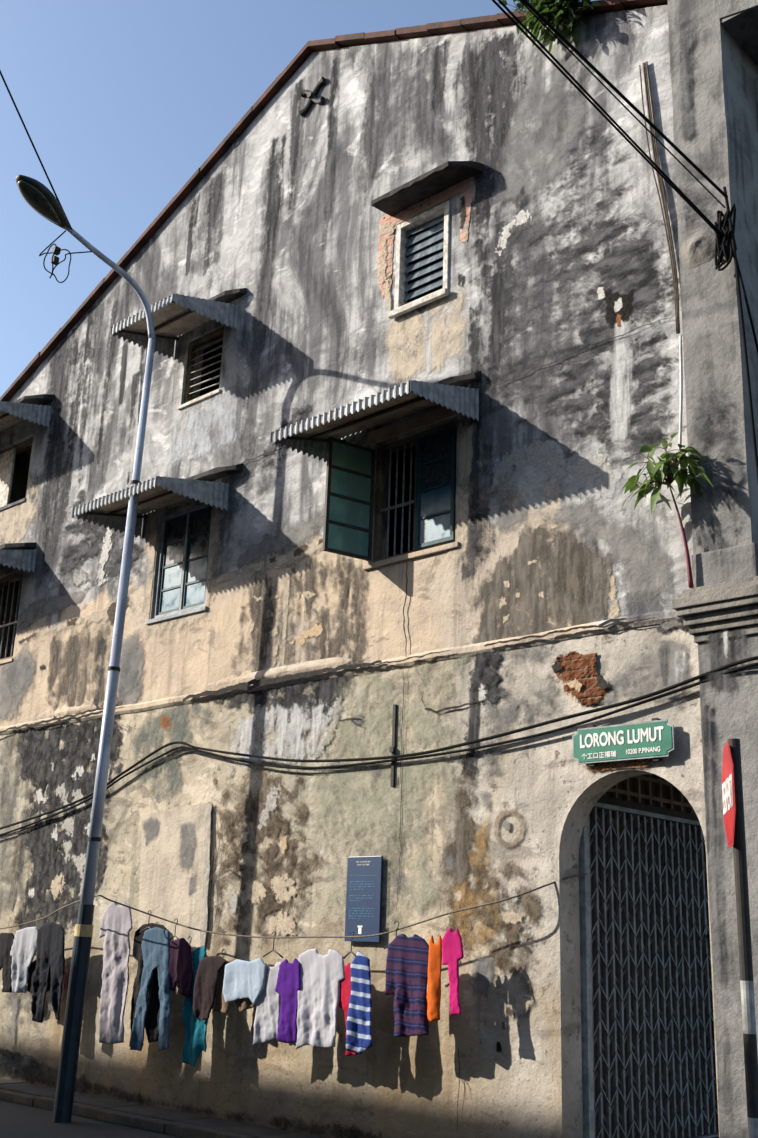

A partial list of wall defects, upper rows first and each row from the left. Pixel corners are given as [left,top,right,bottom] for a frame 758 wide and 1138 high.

damp [185,172,223,275]
damp [253,80,305,355]
damp [322,60,339,248]
spalling [377,177,474,309]
spalling [597,287,634,328]
damp [40,283,148,590]
peeling [217,538,323,583]
damp [358,33,690,996]
damp [684,388,741,499]
damp [0,557,368,956]
spalling [549,646,612,706]
damp [703,704,720,968]